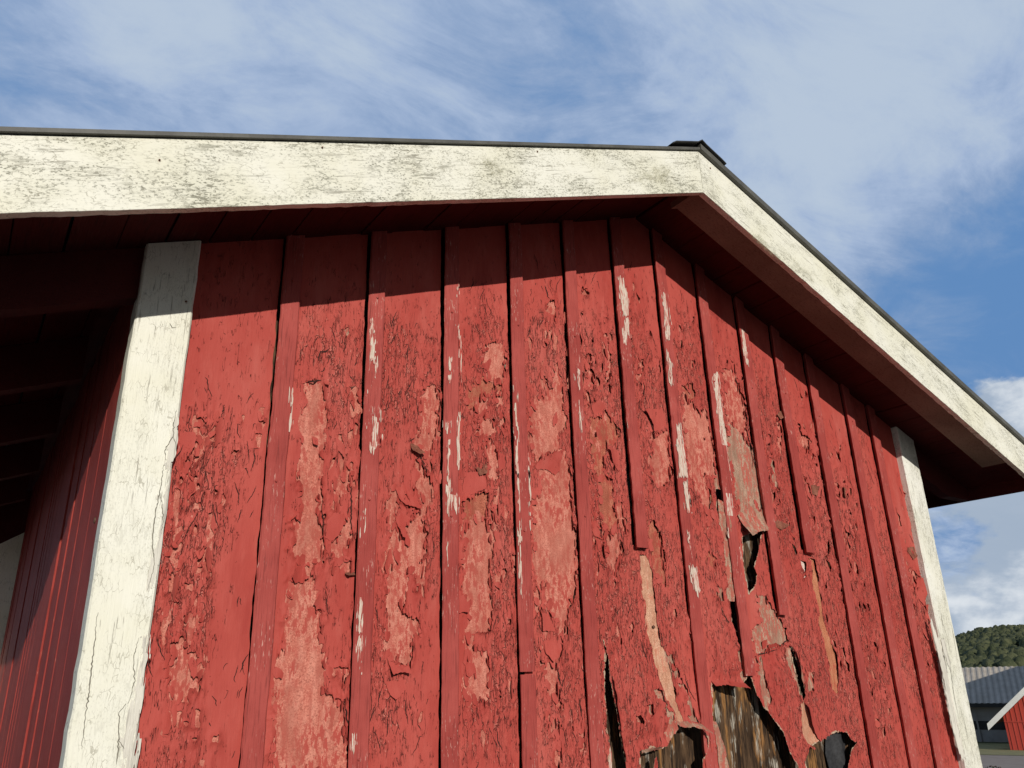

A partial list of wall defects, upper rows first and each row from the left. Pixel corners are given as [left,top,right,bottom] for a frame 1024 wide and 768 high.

peeling [369,318,378,379]
crack [81,615,98,745]
crack [116,639,165,764]
peeling [120,411,226,768]
peeling [268,375,383,768]
crack [463,605,631,768]
peeling [381,275,729,768]
peeling [636,292,862,694]
peeling [712,592,821,746]
peeling [905,539,966,762]